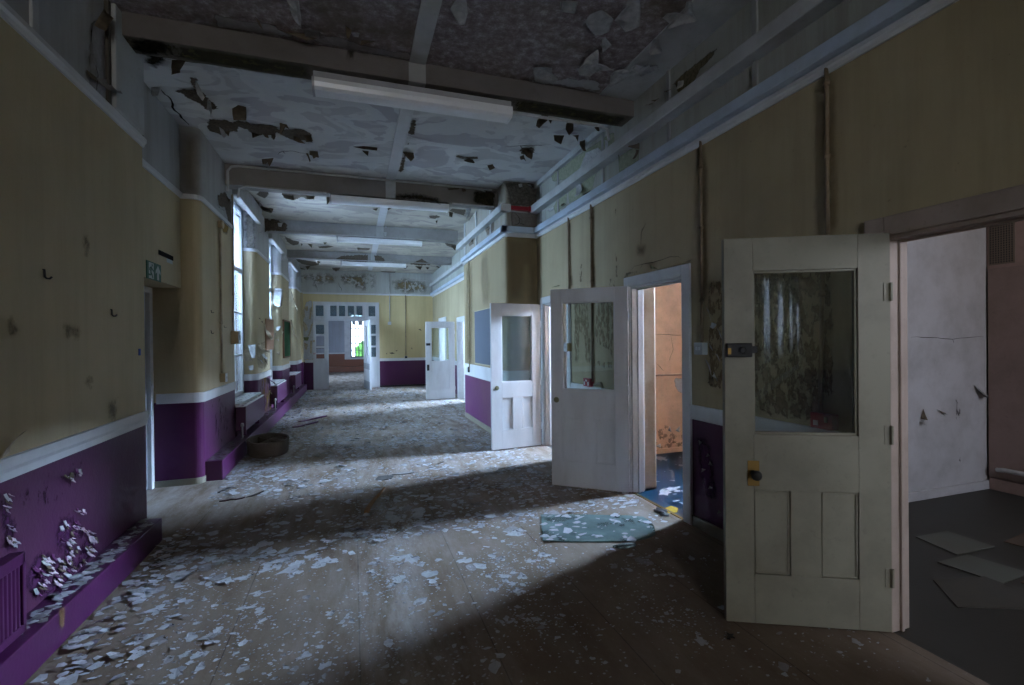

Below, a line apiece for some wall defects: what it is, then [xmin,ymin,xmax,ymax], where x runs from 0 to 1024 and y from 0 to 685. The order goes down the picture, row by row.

peeling [560,0,641,77]
peeling [649,49,717,105]
crack [161,90,189,125]
peeling [171,60,319,162]
peeling [399,118,416,172]
peeling [456,155,495,170]
peeling [218,192,441,273]
peeling [429,208,471,223]
peeling [27,282,792,685]
peeling [0,493,21,549]